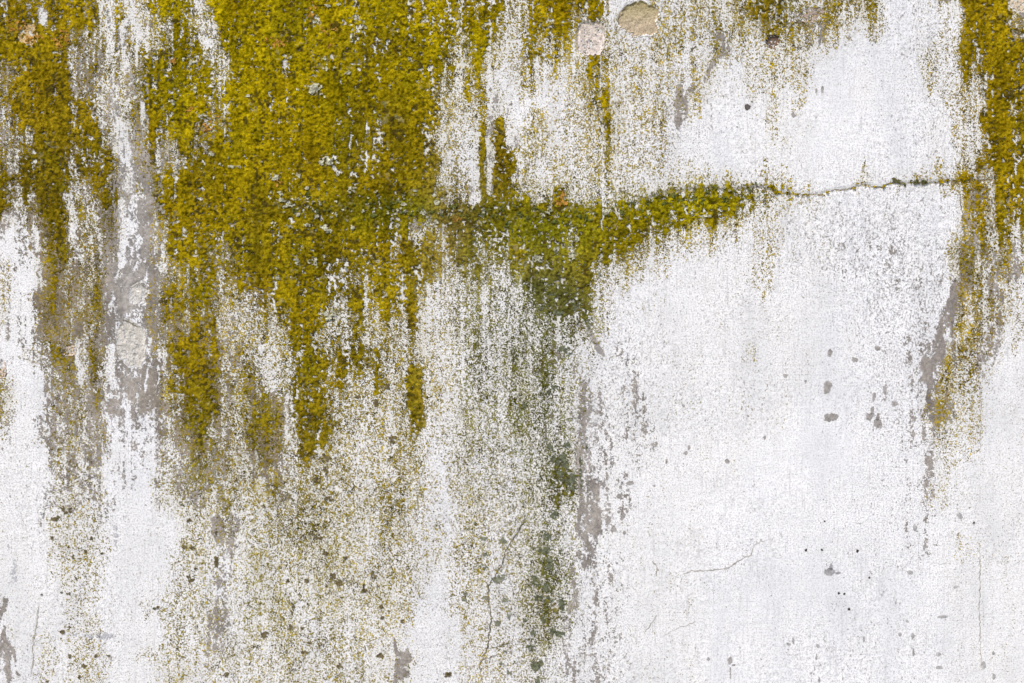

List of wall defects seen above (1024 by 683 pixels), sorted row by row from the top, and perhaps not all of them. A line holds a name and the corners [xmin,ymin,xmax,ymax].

spalling [576,0,660,56]
damp [918,31,946,99]
damp [505,1,814,221]
crack [697,178,993,285]
damp [0,368,17,440]
damp [18,315,118,683]
damp [134,165,820,683]
damp [926,420,986,508]
crack [652,539,771,575]